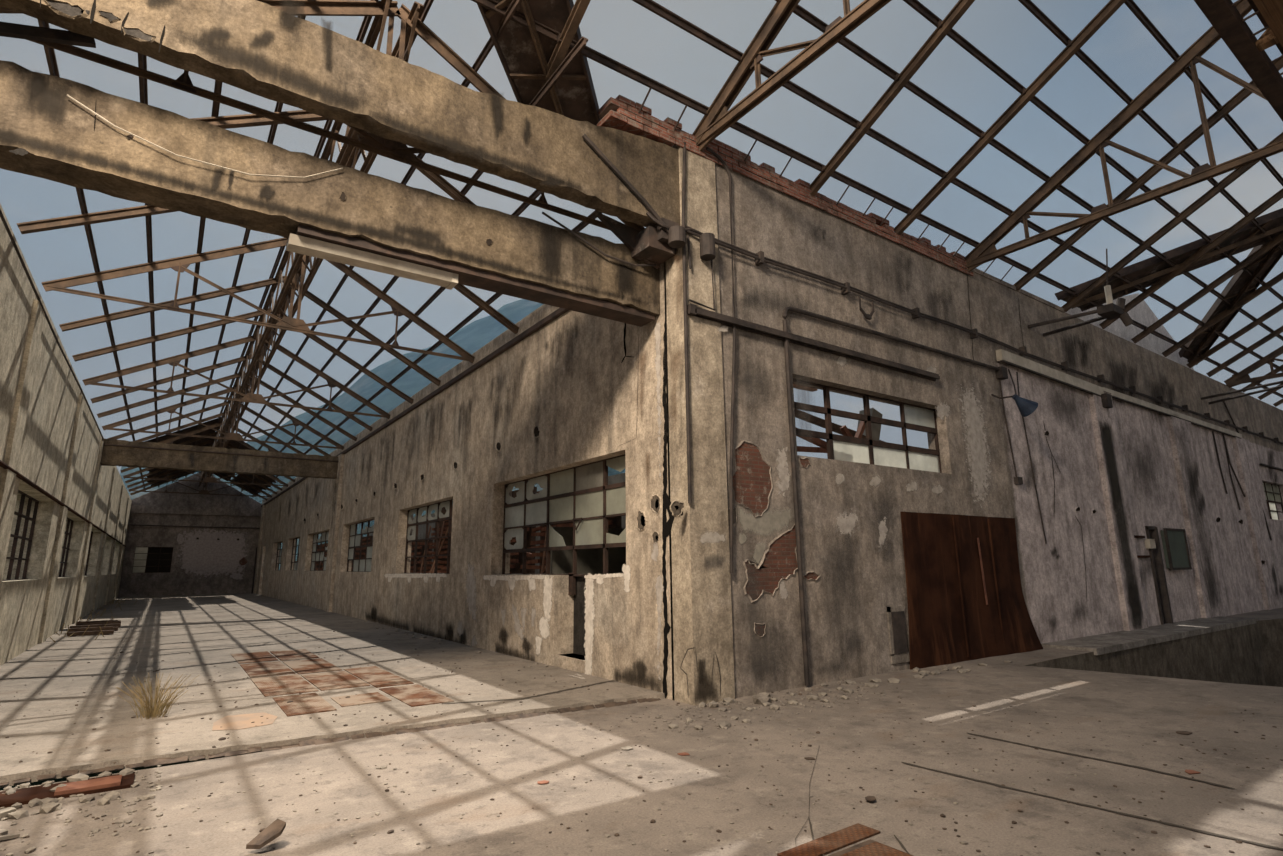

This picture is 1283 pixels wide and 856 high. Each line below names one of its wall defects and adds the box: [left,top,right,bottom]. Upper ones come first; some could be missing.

flaking render [597,95,974,276]
crack [619,321,721,698]
flaking render [728,440,820,603]
water stain [365,606,466,643]
water stain [496,629,534,661]